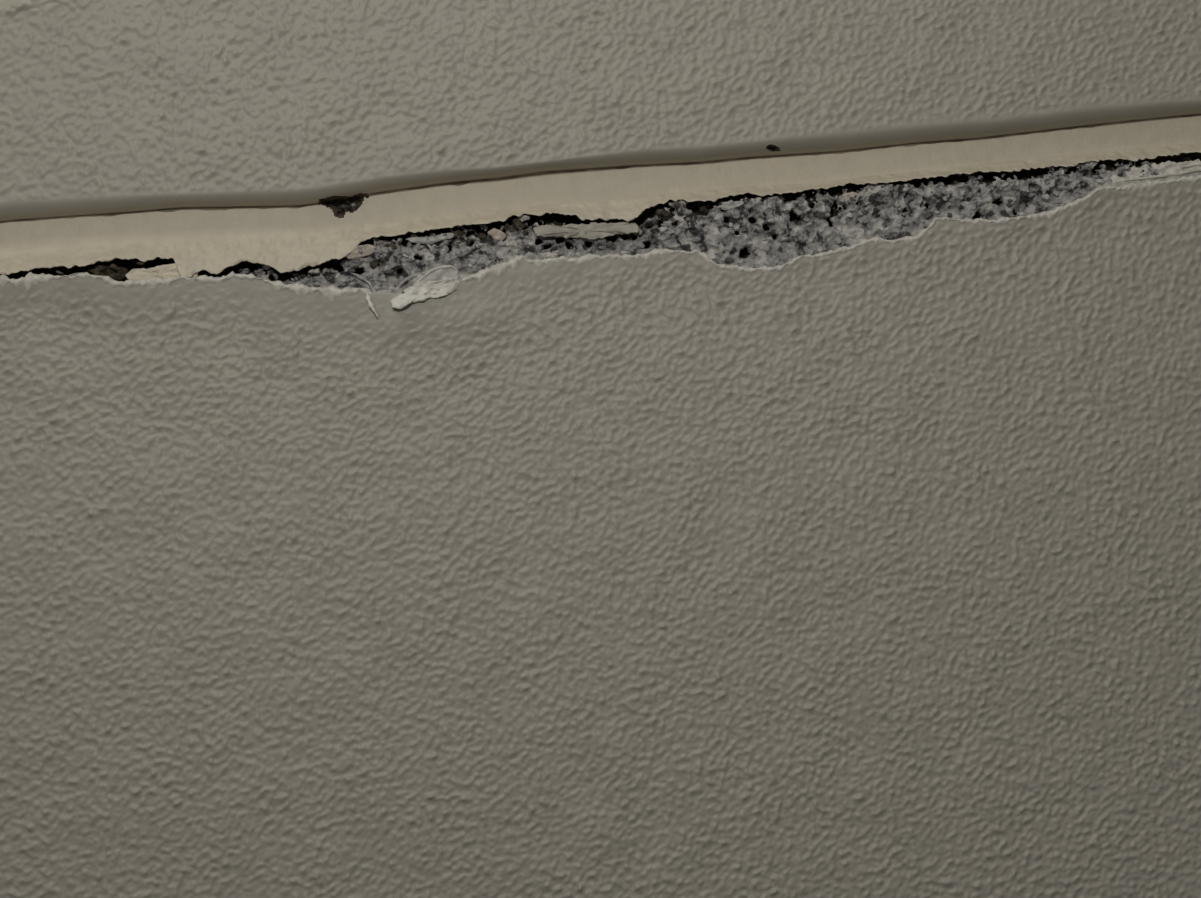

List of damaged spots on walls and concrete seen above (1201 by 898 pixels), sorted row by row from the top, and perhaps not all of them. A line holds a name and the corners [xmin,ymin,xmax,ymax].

flaking render [191,160,1158,317]